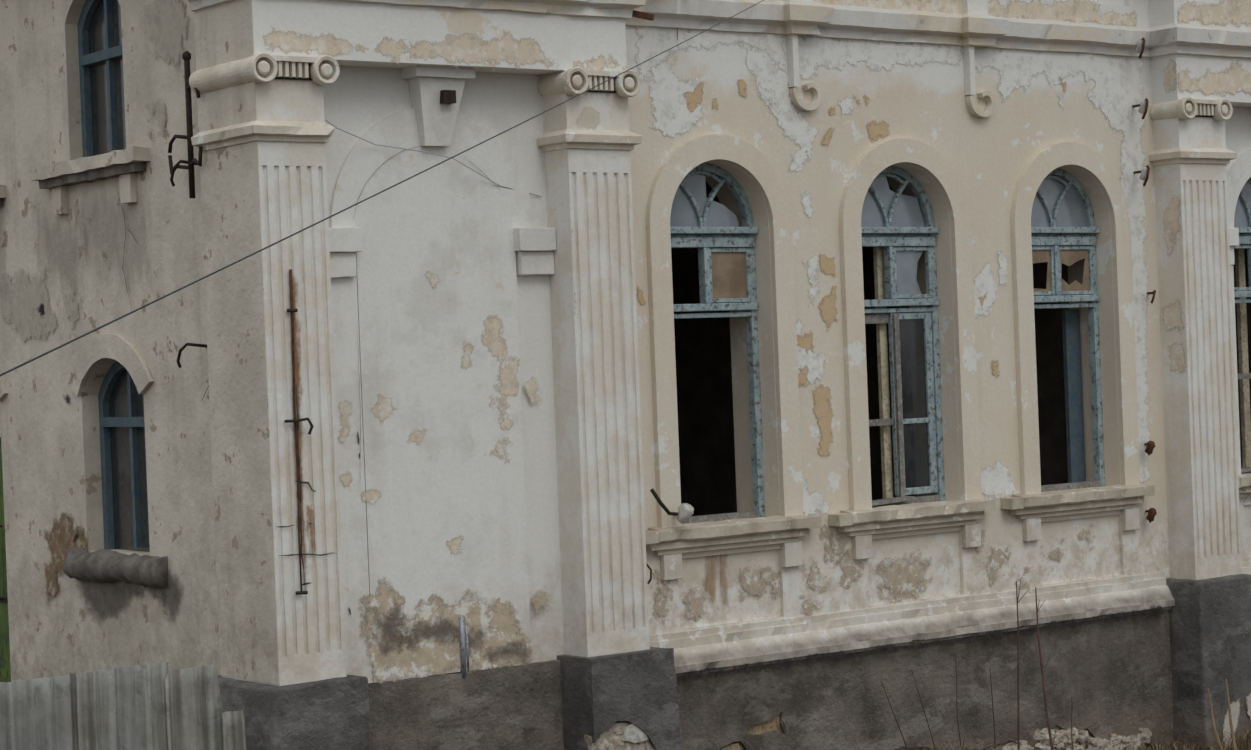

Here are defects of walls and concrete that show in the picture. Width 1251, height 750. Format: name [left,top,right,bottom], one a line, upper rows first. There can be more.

peeling [263,28,559,71]
peeling [648,58,719,138]
peeling [987,0,1137,27]
peeling [1164,60,1251,96]
peeling [1178,0,1251,27]
rust [293,278,315,553]
peeling [461,315,541,463]
peeling [797,254,837,456]
peeling [800,478,933,616]
water stain [360,578,549,683]
peeling [650,569,708,623]
spalling [584,722,654,750]